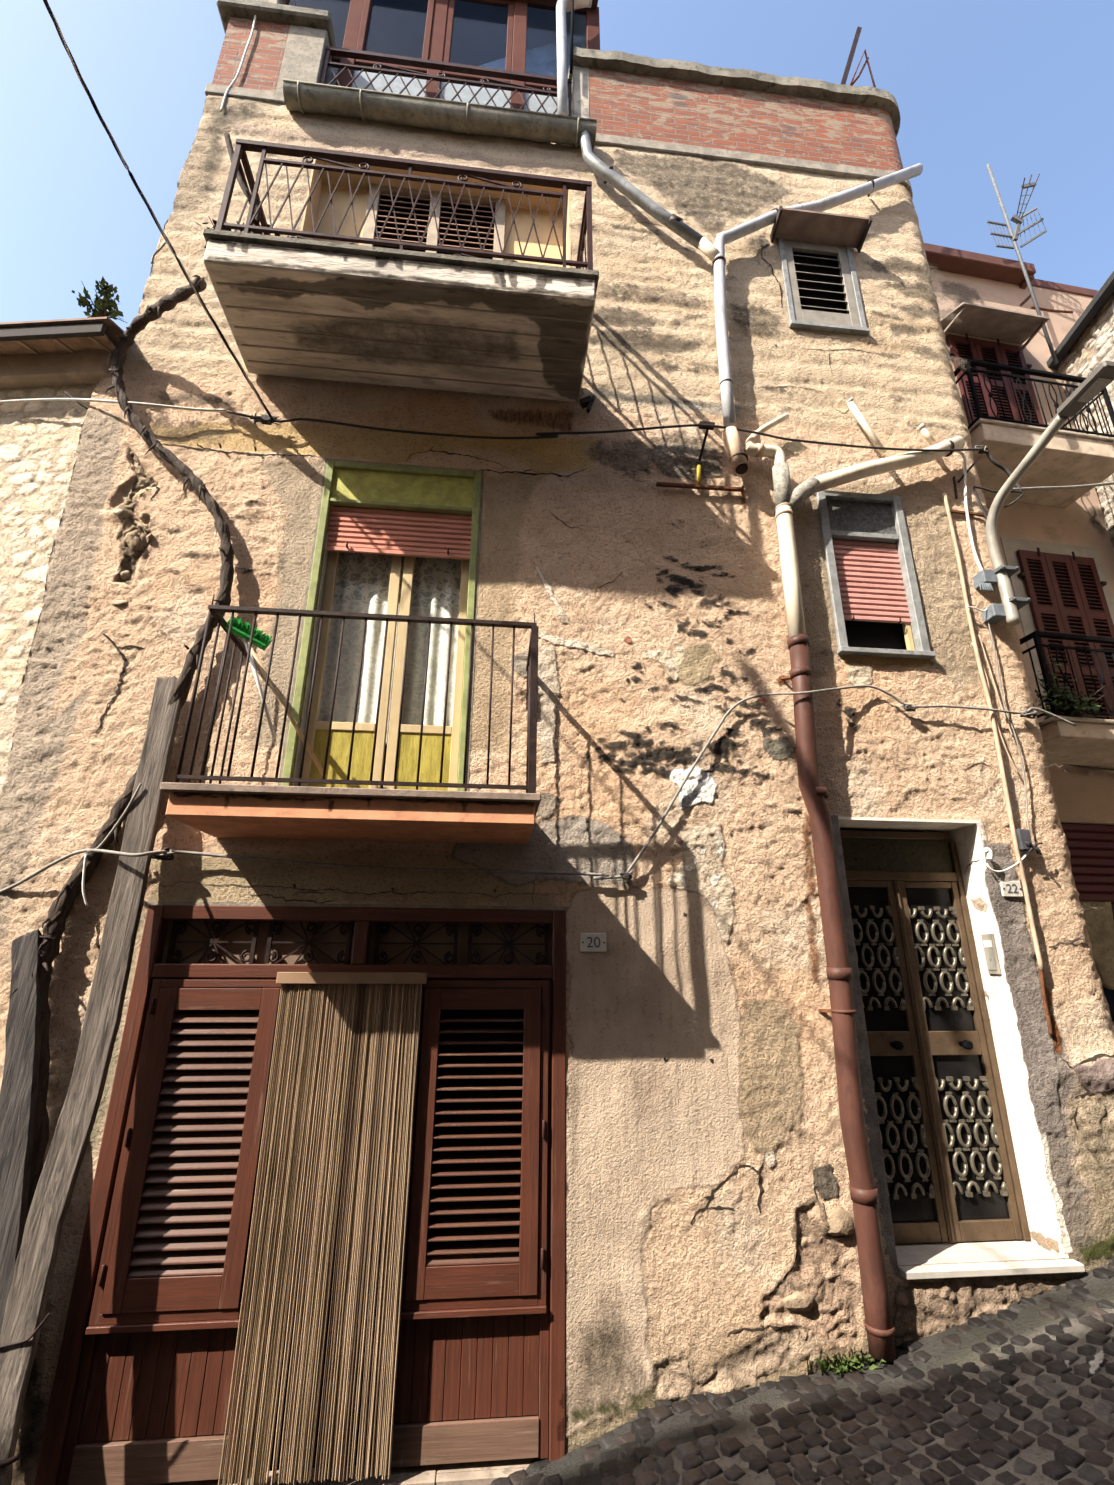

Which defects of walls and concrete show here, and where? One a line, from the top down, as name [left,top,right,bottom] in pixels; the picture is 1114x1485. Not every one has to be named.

damp [615,149,792,234]
damp [208,239,722,405]
damp [734,305,780,337]
damp [867,257,980,368]
spalling [112,446,179,623]
crack [95,634,144,733]
peeling [624,636,685,680]
crack [690,1153,766,1224]
peeling [764,1151,776,1168]
spalling [791,1196,854,1245]
peeling [1029,1132,1073,1253]
spalling [765,1281,825,1313]